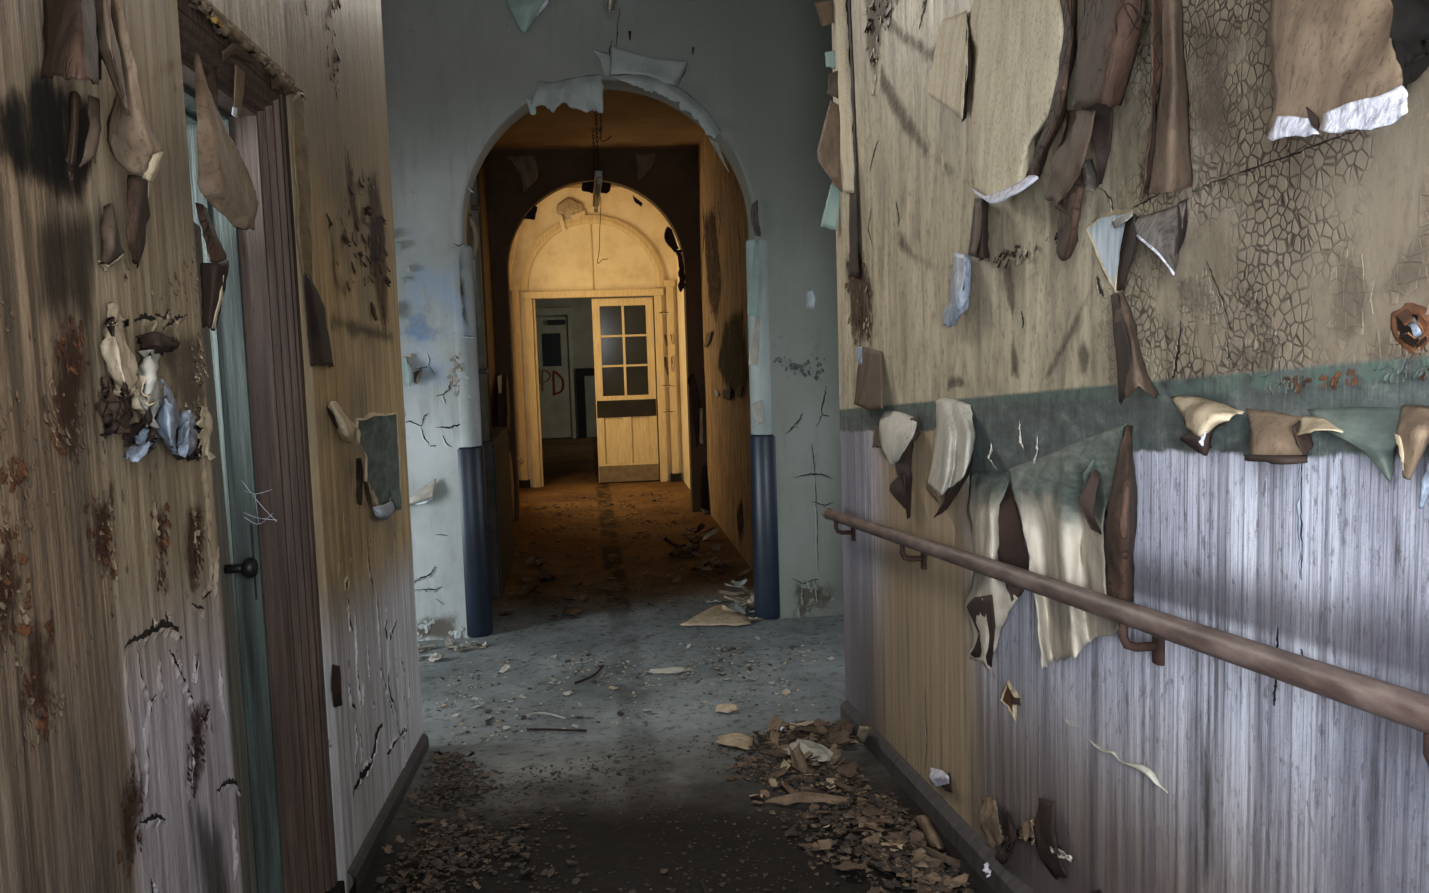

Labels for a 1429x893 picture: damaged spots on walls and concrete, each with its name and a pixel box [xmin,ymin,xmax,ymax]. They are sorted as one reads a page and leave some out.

peeling [526,45,729,172]
crack [1100,129,1371,225]
peeling [0,0,411,766]
crack [404,333,475,448]
peeling [747,200,829,381]
peeling [814,0,1137,602]
crack [1171,321,1182,380]
peeling [927,0,1429,580]
crack [786,386,834,609]
crack [124,456,241,882]
peeling [965,572,1118,669]
damp [194,815,229,893]